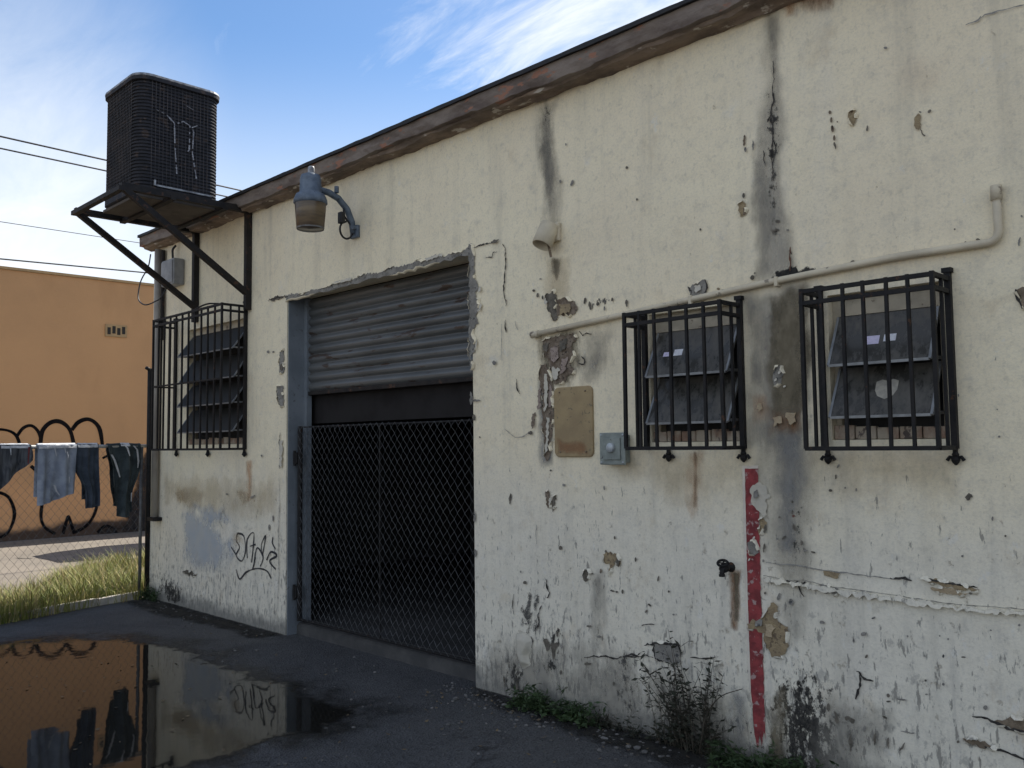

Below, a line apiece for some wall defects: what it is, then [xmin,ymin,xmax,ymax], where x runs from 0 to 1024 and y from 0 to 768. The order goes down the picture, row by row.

leakage [540,139,554,204]
crack [763,62,777,181]
leakage [762,94,816,278]
spalling [285,243,482,372]
crack [474,239,517,347]
spalling [532,278,628,321]
peeling [531,333,578,471]
leakage [520,588,539,633]
crack [584,652,653,660]
corrosion [731,572,739,629]
spalling [747,592,794,659]
leakage [696,666,857,768]